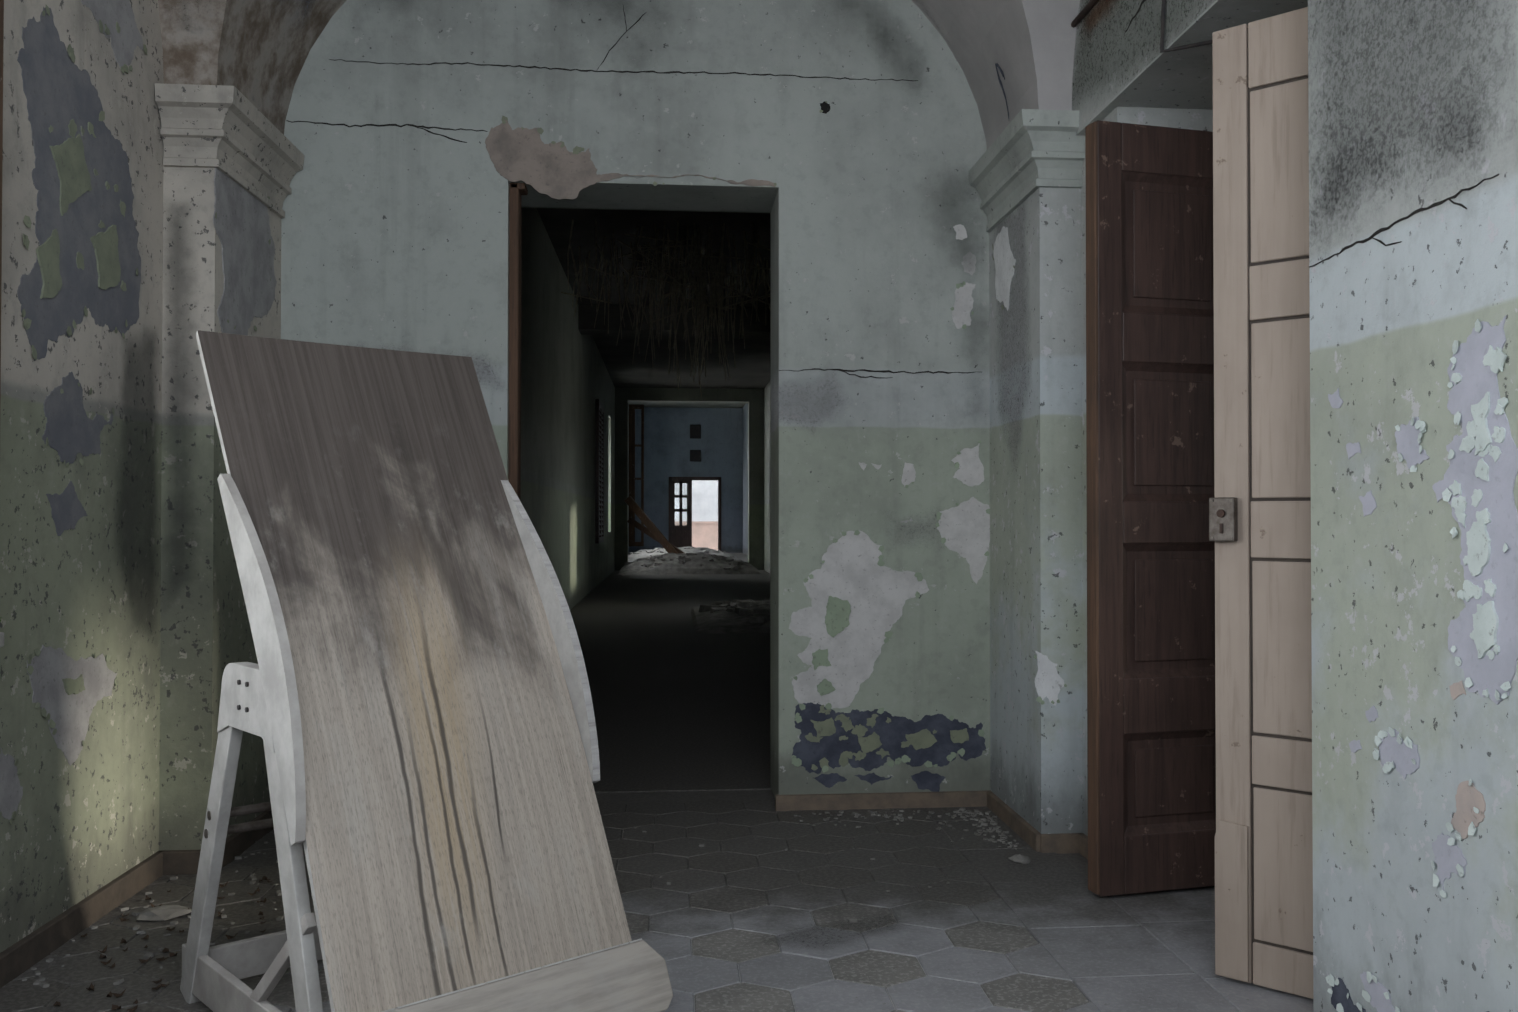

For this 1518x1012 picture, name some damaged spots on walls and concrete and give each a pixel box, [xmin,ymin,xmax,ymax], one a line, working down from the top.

crack [1125,0,1146,33]
peeling [17,5,141,361]
spalling [485,116,777,200]
peeling [950,224,1016,329]
damp [1308,0,1499,212]
crack [1309,173,1500,268]
peeling [42,372,114,536]
peeling [935,440,990,584]
peeling [1432,316,1518,705]
peeling [789,530,986,792]
peeling [1349,706,1420,779]
peeling [1325,971,1400,1012]